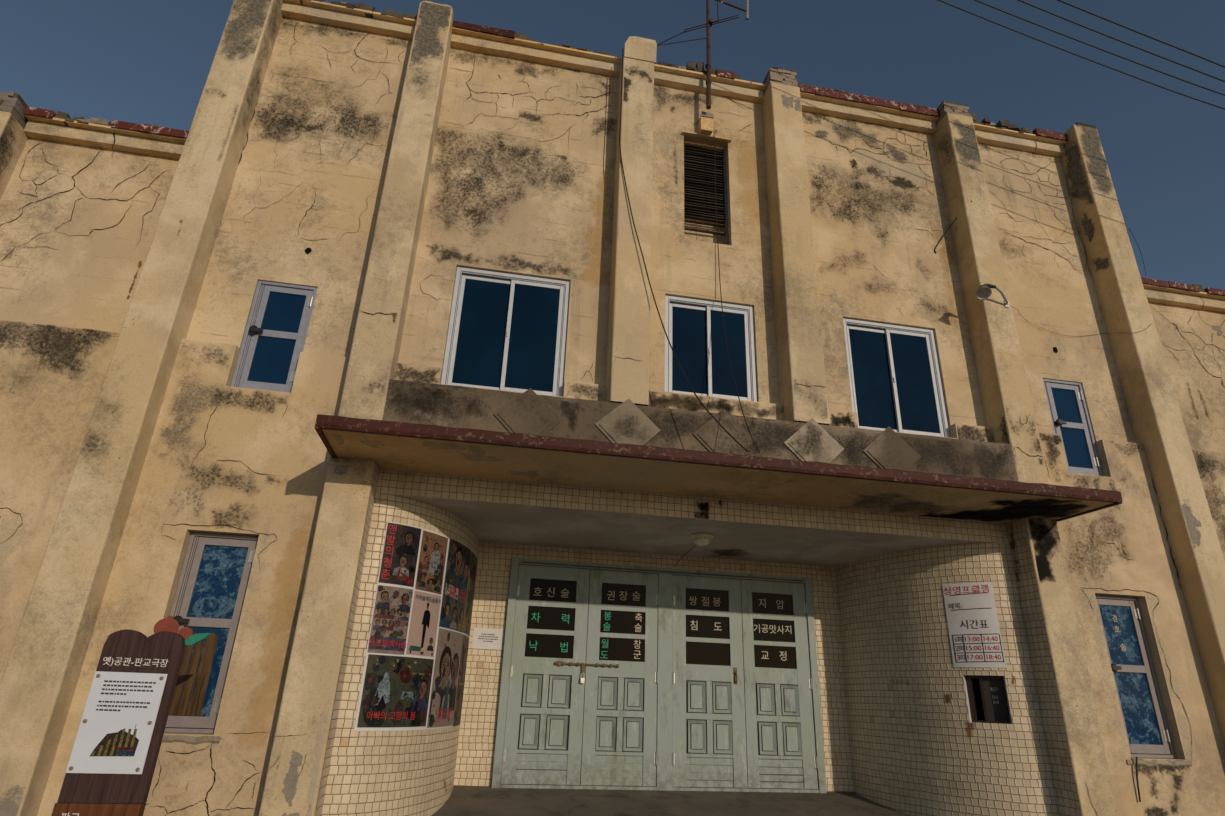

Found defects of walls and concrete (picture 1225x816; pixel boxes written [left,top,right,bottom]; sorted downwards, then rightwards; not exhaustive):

damp [222,0,288,59]
crack [272,23,407,104]
crack [453,52,615,144]
crack [0,133,165,262]
crack [218,100,386,241]
damp [433,129,575,234]
damp [802,113,916,237]
damp [0,322,110,371]
damp [1029,422,1125,491]
peeling [1182,504,1201,548]
crack [146,732,307,816]
peeling [277,751,312,816]